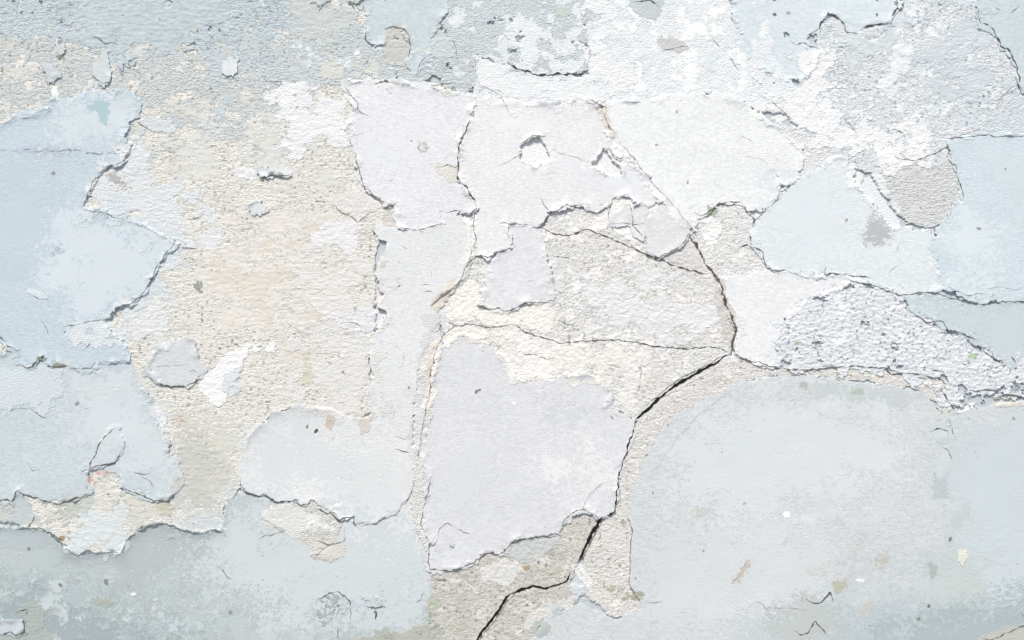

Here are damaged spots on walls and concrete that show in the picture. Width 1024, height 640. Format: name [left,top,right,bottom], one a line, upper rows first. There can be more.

peeling [0,0,814,563]
crack [349,99,737,609]
spalling [360,0,1024,640]
crack [741,244,799,276]